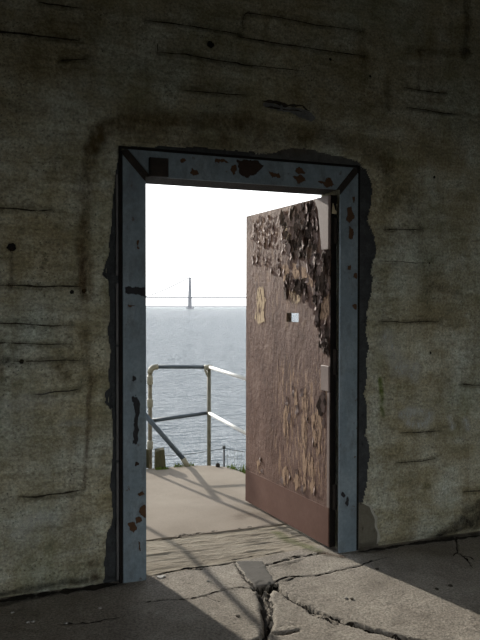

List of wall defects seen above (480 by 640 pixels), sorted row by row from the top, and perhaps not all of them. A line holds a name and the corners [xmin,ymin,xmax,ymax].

corrosion [215,159,281,178]
spalling [131,145,380,548]
corrosion [128,505,146,533]
crack [149,535,480,640]